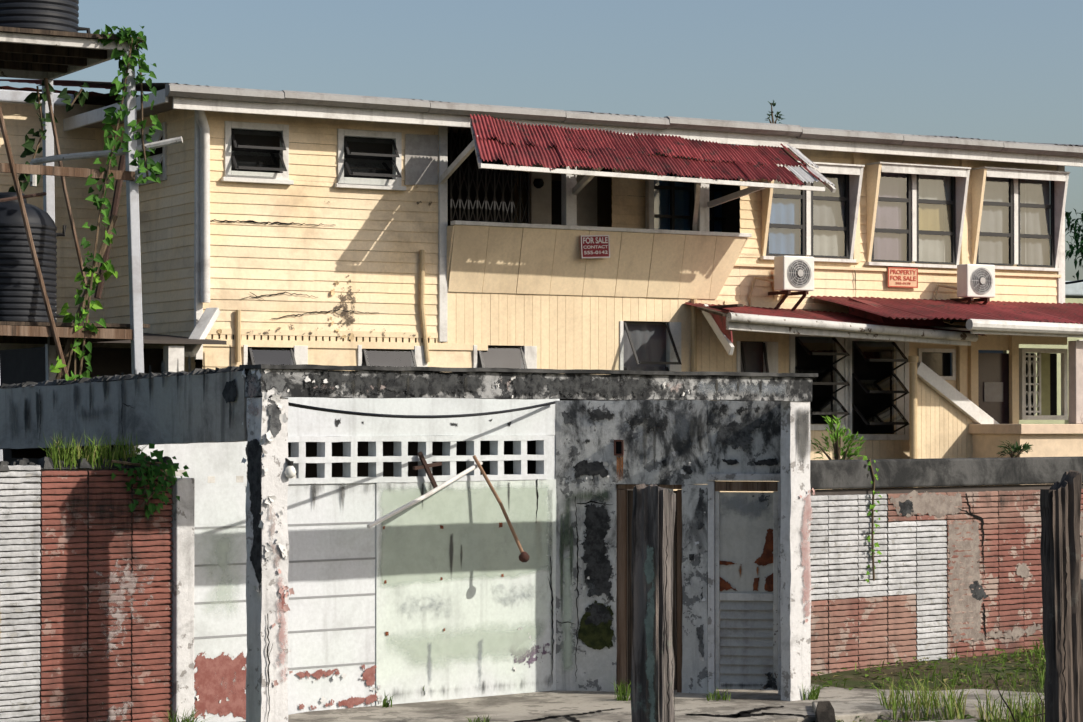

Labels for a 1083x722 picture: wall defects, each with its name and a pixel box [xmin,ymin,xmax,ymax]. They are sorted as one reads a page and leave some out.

crack [210,218,324,226]
crack [241,292,378,319]
leakage [13,392,39,431]
leakage [122,352,205,408]
mould [304,370,483,397]
peeling [0,366,347,686]
crack [958,493,985,575]
leakage [380,482,608,669]
flaking render [890,490,1041,645]
peeling [194,651,247,720]
peeling [299,664,382,709]
crack [514,708,621,722]